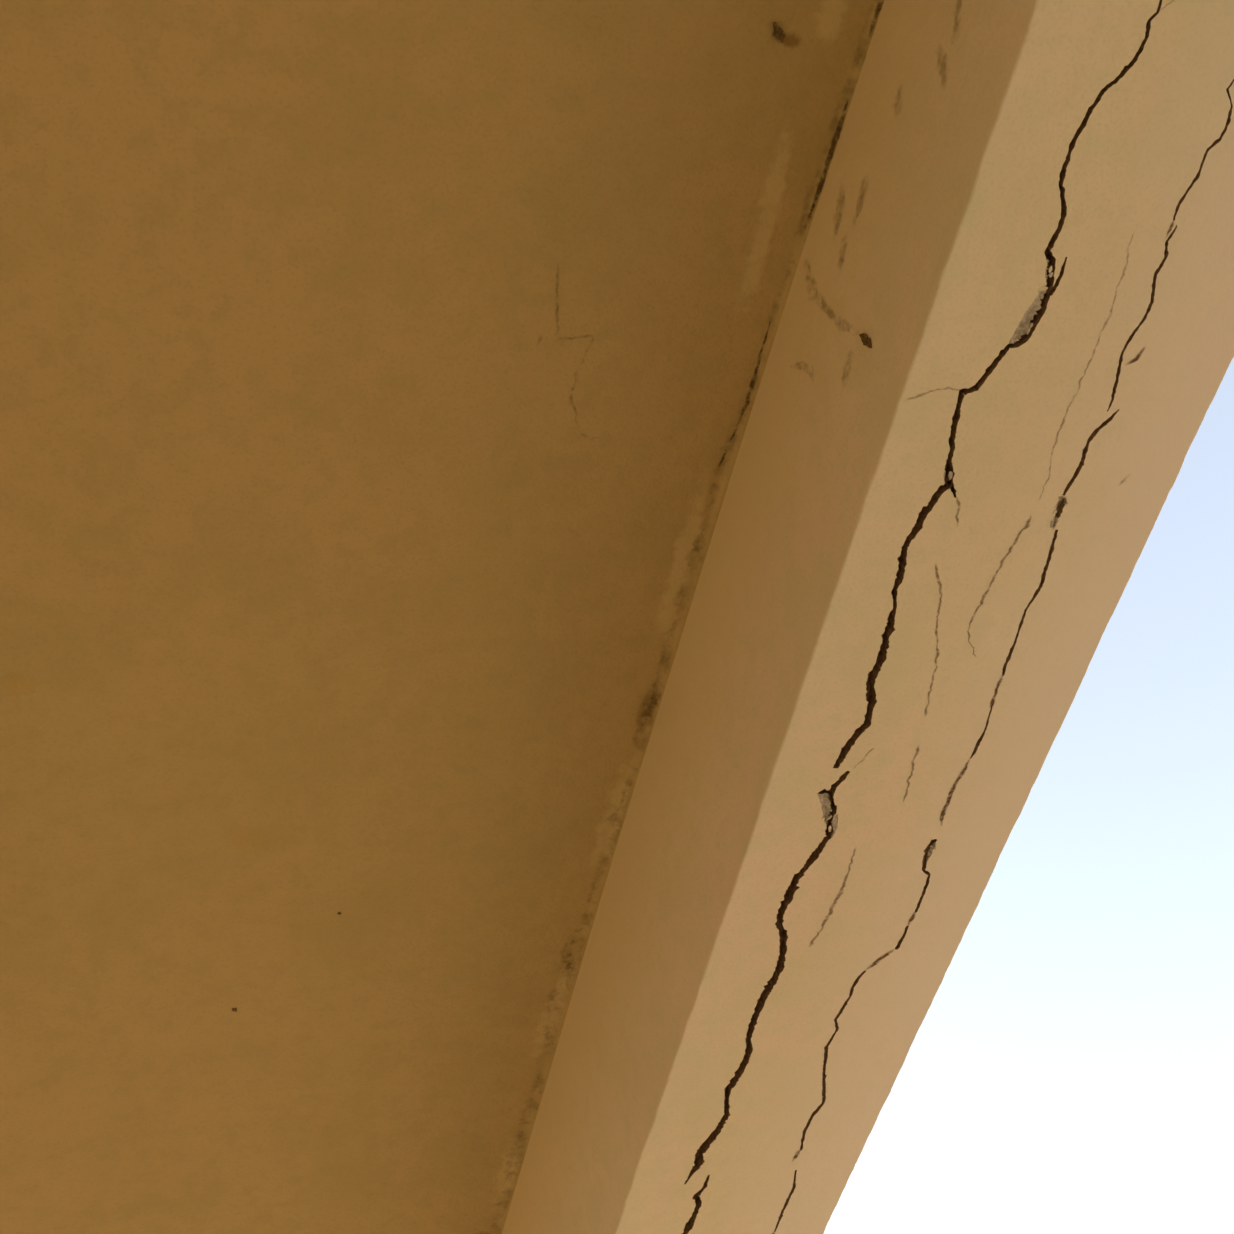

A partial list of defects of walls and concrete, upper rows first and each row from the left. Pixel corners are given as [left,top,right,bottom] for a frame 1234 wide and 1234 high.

crack [682,0,1234,1234]
flaking render [1009,259,1053,344]